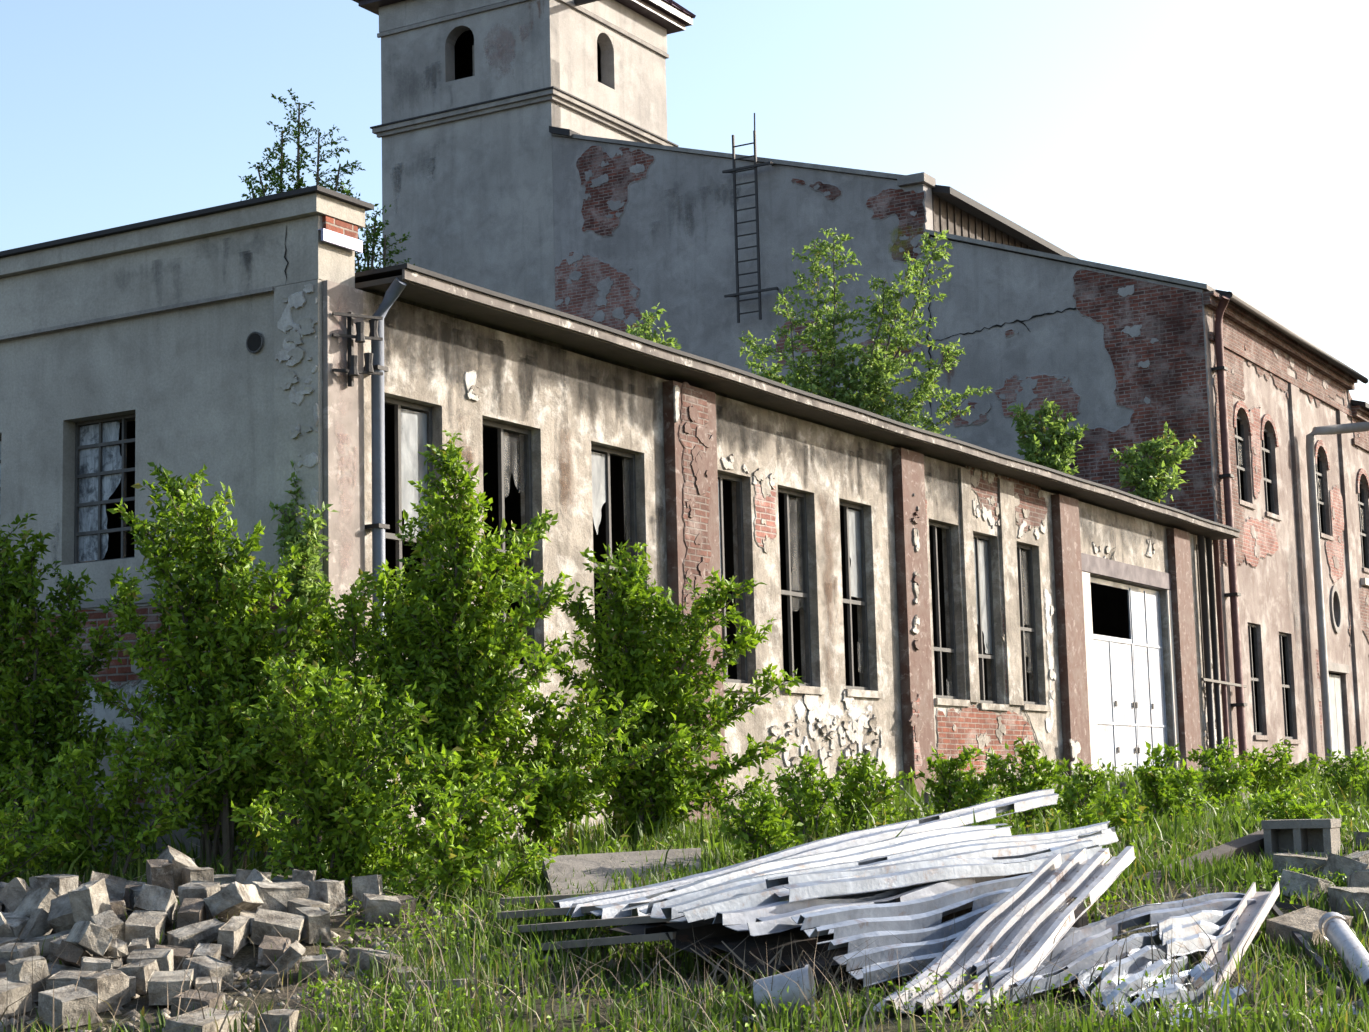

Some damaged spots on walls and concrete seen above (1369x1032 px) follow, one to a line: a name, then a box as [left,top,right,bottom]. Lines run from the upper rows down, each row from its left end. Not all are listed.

flaking render [4,600,200,737]
flaking render [248,592,298,689]